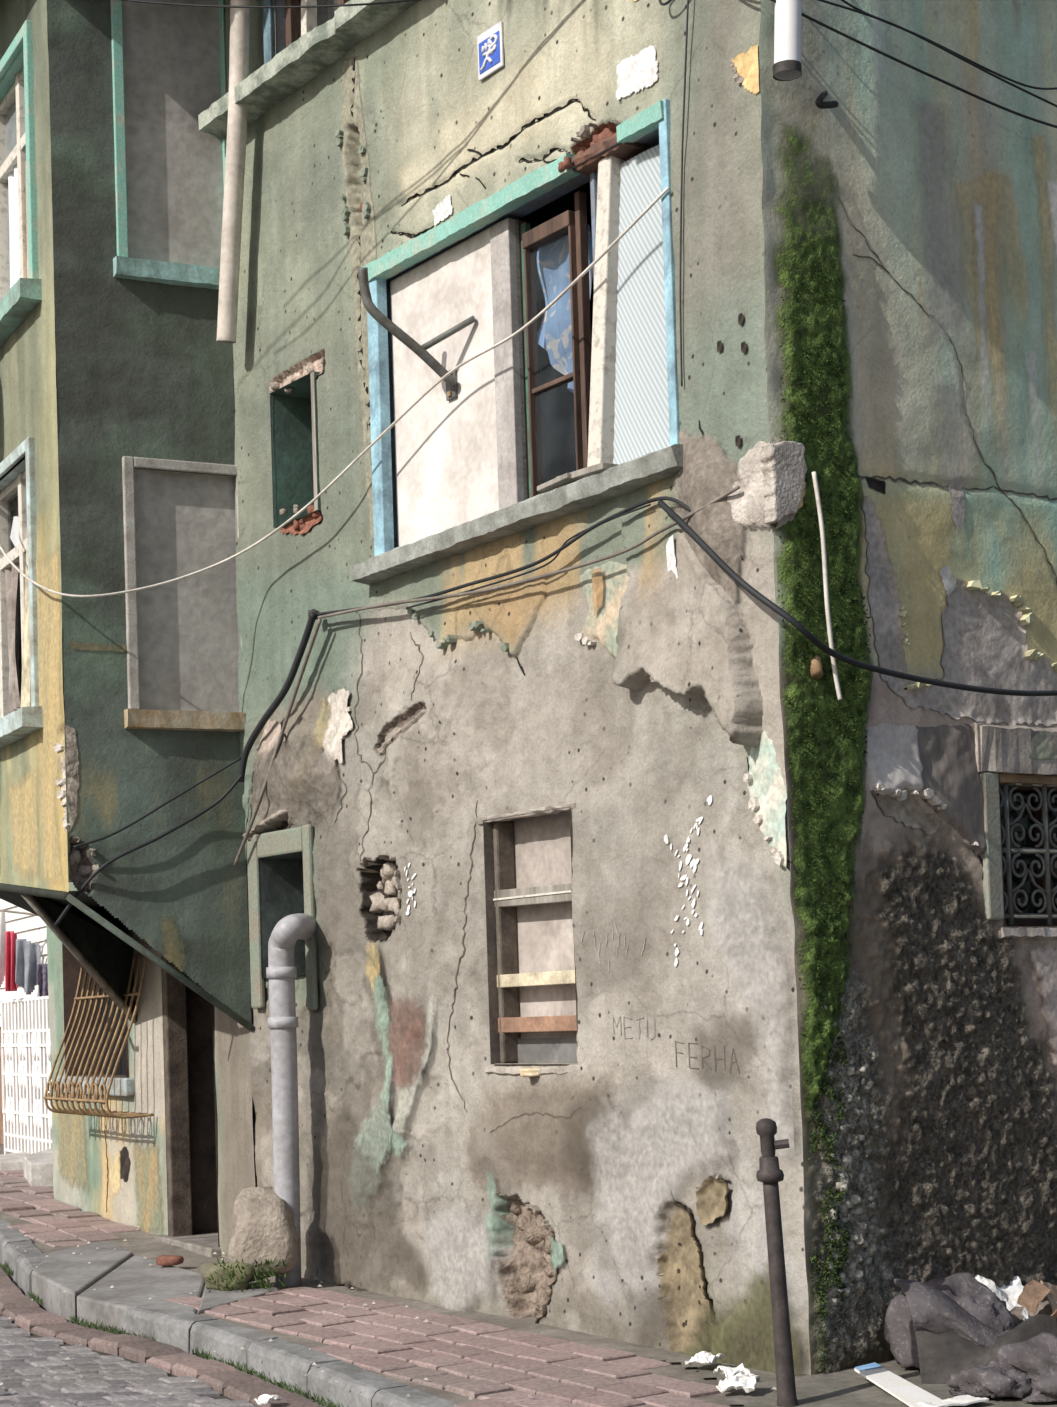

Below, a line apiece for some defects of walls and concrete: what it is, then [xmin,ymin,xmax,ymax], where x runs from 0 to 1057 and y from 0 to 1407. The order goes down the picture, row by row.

crack [335,58,596,539]
crack [839,198,1057,583]
peeling [312,688,353,765]
flaking render [363,537,547,676]
flaking render [574,495,795,873]
peeling [862,496,1057,898]
leakage [709,862,789,1140]
leakage [811,840,1057,1369]
flaking render [486,1172,564,1323]
flaking render [654,1174,730,1352]
leakage [683,1269,776,1373]
leakage [790,1325,799,1377]